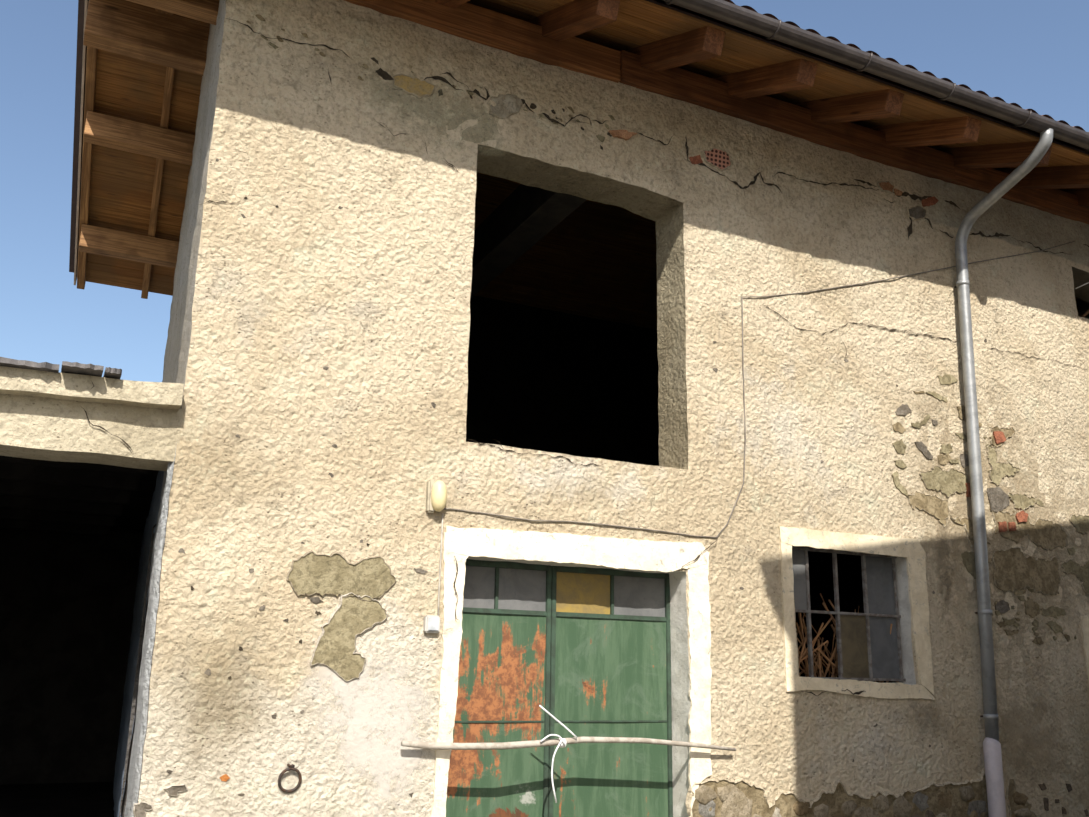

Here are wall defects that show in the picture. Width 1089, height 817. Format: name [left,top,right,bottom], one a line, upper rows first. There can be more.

flaking render [358,57,473,99]
crack [424,72,490,100]
flaking render [487,94,584,130]
crack [523,101,605,127]
flaking render [596,115,637,150]
crack [639,133,1089,255]
crack [764,305,957,355]
crack [83,382,134,454]
peeling [891,374,976,579]
peeling [979,423,1089,659]
peeling [286,539,397,682]